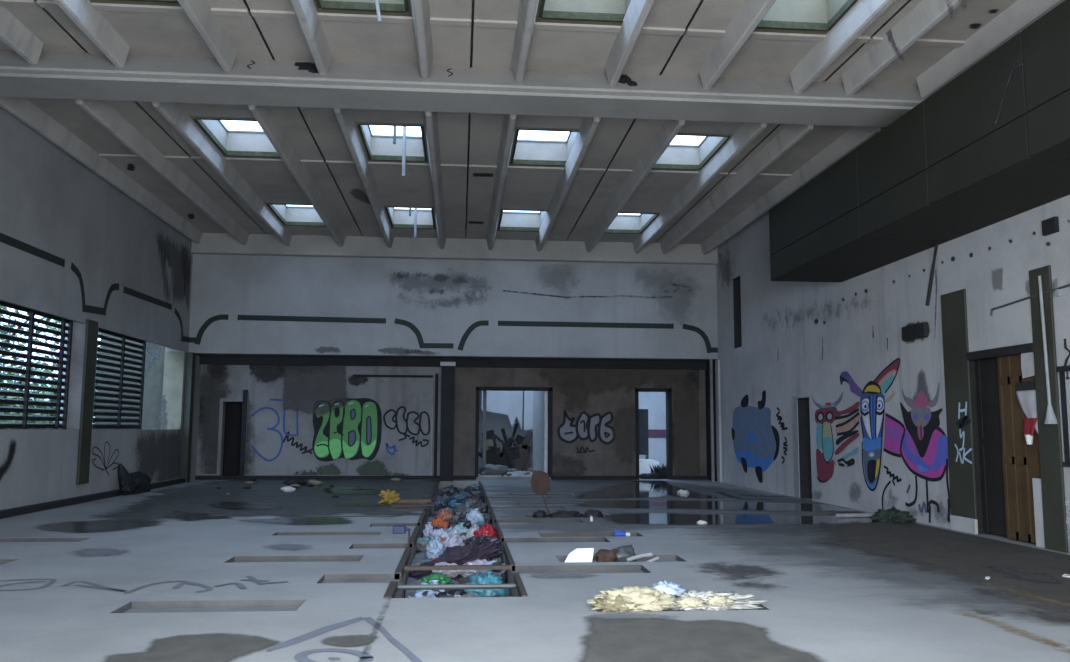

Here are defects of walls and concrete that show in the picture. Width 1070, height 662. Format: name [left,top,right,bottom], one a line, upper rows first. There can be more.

peeling [397,273,466,293]
crack [503,290,606,298]